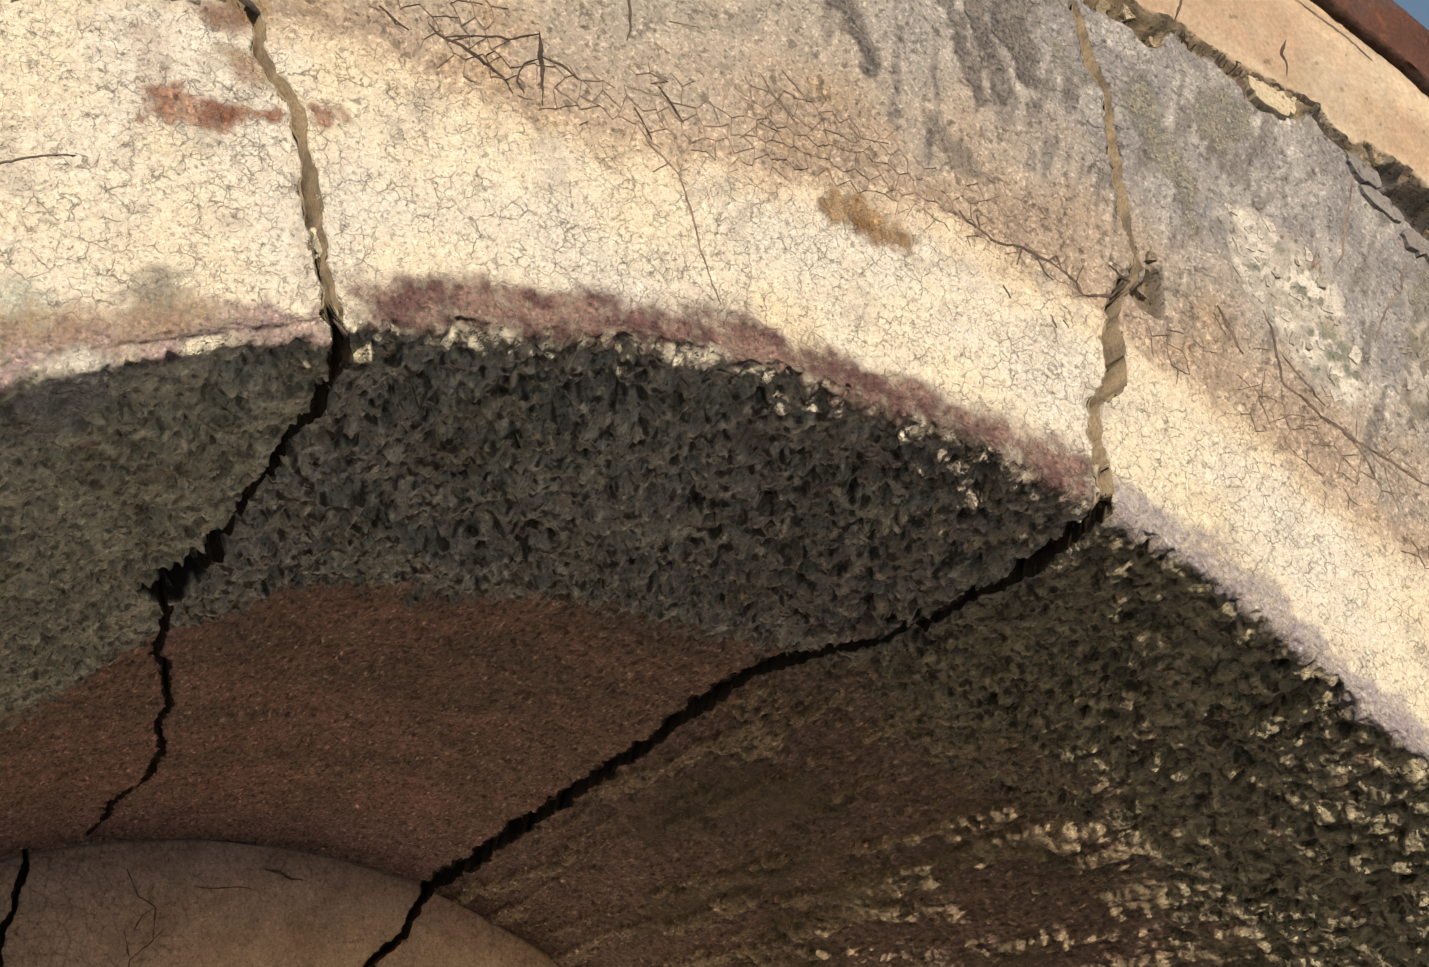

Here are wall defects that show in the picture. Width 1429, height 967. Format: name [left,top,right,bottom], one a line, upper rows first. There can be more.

spalling [1080,0,1178,49]
corrosion [138,83,283,133]
corrosion [309,103,349,127]
spalling [1246,75,1297,120]
crack [0,154,76,164]
spalling [1345,141,1429,265]
crack [86,0,354,967]
crack [363,0,1429,967]
crack [0,849,30,967]